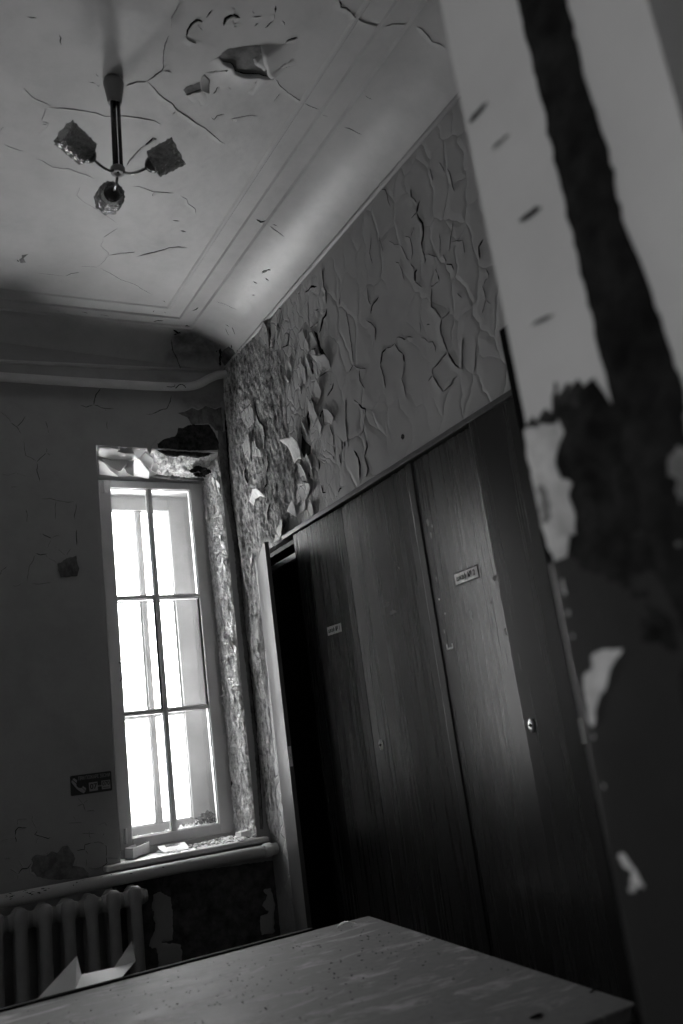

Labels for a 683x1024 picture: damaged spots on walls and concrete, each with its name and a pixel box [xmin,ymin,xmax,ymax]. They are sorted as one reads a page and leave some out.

crack [332,0,446,49]
crack [0,0,361,258]
crack [267,189,463,496]
flaking render [517,0,683,653]
peeling [57,555,83,581]
flaking render [98,321,334,840]
flaking render [583,649,623,740]
flaking render [28,845,281,970]
spalling [618,853,644,893]